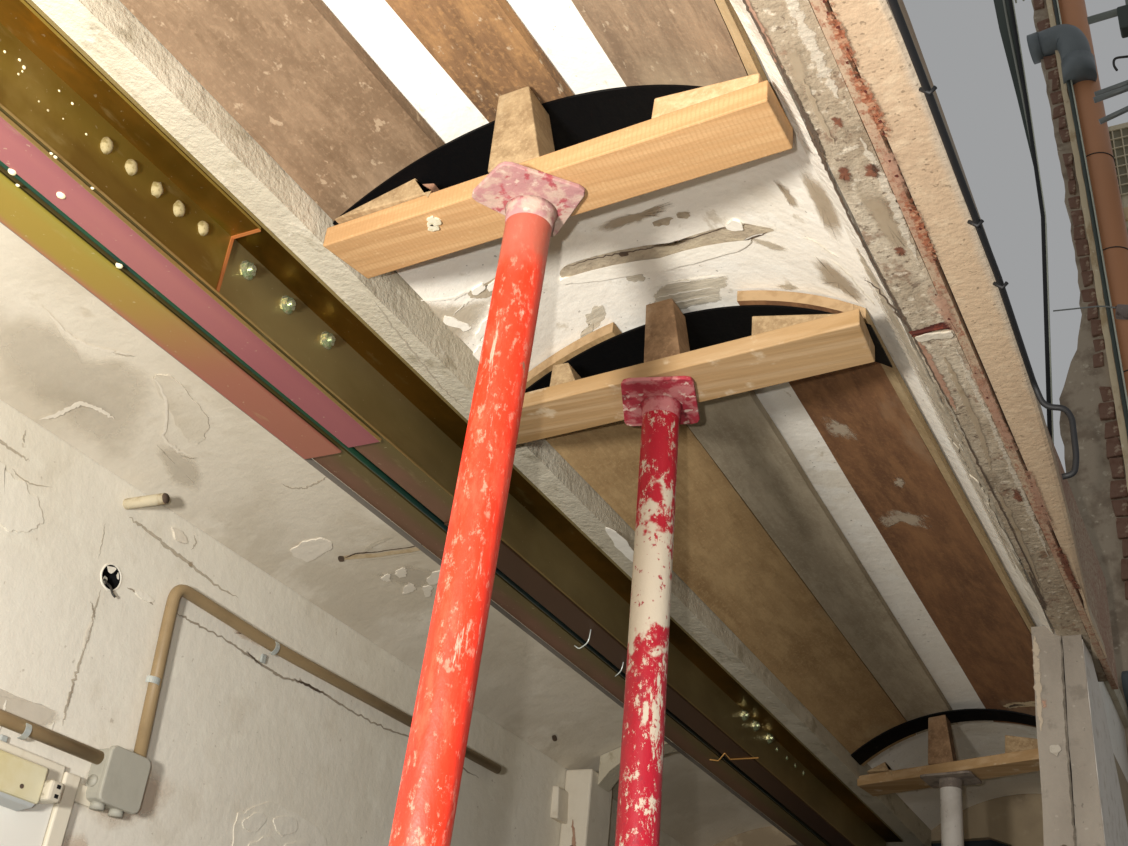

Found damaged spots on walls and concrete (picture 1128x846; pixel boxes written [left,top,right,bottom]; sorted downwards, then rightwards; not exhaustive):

crack [560,218,774,285]
peeling [626,274,727,309]
peeling [443,305,490,361]
peeling [581,306,606,338]
peeling [39,401,114,420]
crack [0,434,47,487]
crack [129,517,238,598]
peeling [380,567,440,597]
crack [63,590,101,720]
crack [128,588,409,737]